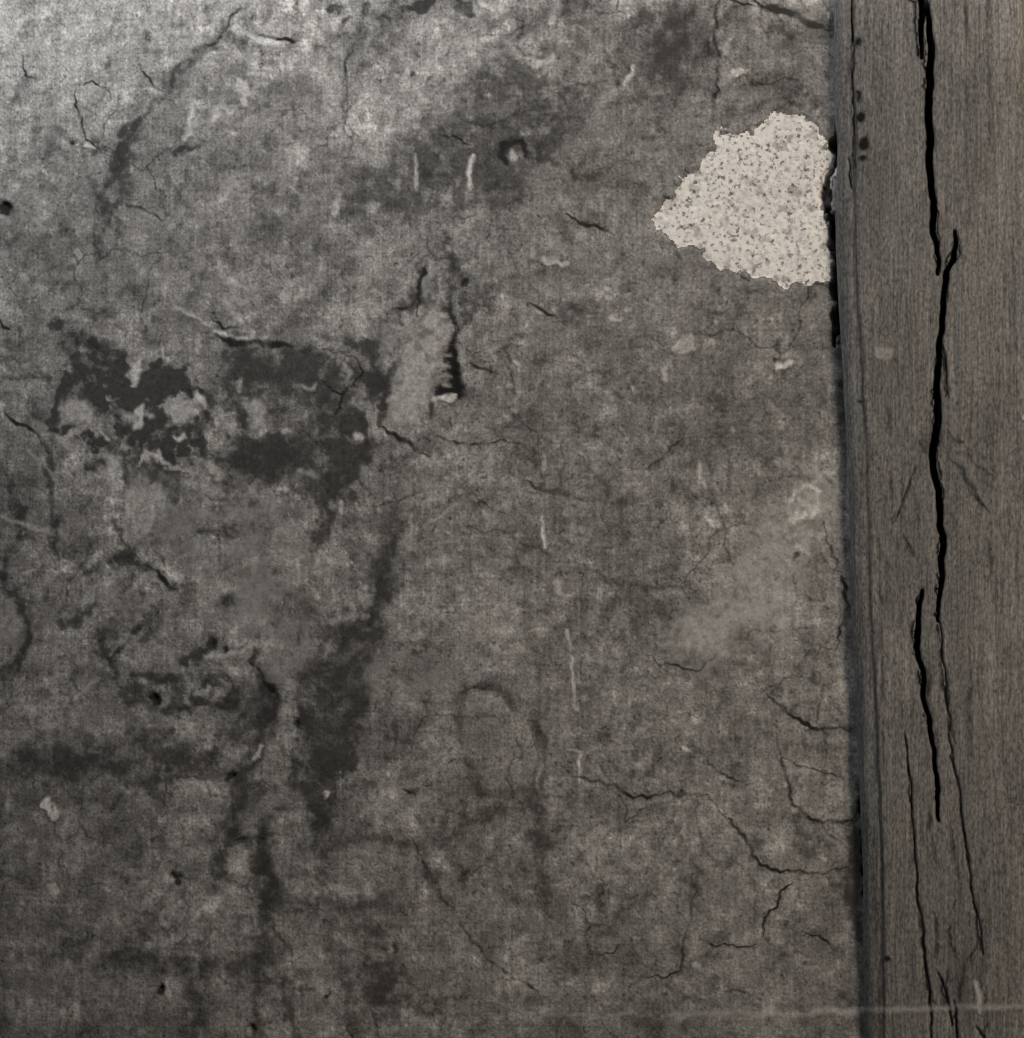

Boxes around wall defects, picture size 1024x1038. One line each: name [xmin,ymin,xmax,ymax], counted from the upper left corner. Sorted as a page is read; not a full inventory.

crack [708,0,825,97]
spalling [651,111,837,289]
crack [396,260,428,317]
leakage [45,319,402,560]
leakage [0,559,32,679]
leakage [58,603,96,629]
leakage [113,520,150,570]
crack [143,564,181,595]
crack [893,0,984,1036]
leakage [292,535,396,832]
crack [758,683,855,731]
crack [555,753,862,979]